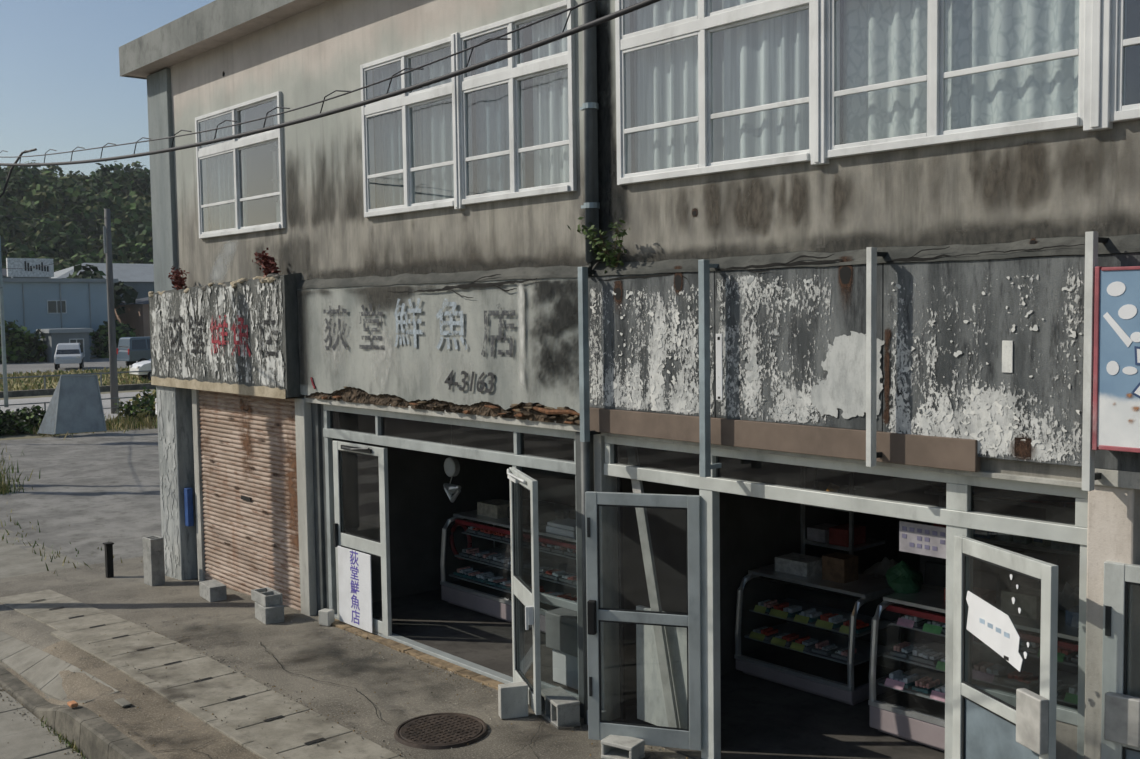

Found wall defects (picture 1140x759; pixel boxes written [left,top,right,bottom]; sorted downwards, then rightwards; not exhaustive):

damp [596,3,627,232]
damp [287,162,330,226]
damp [833,176,850,222]
damp [809,215,1140,253]
damp [972,143,1096,208]
damp [280,177,807,384]
peeling [589,266,1084,464]
peeling [148,273,285,576]
corrosion [229,397,264,472]
spalling [305,386,580,426]
corrosion [273,450,299,550]